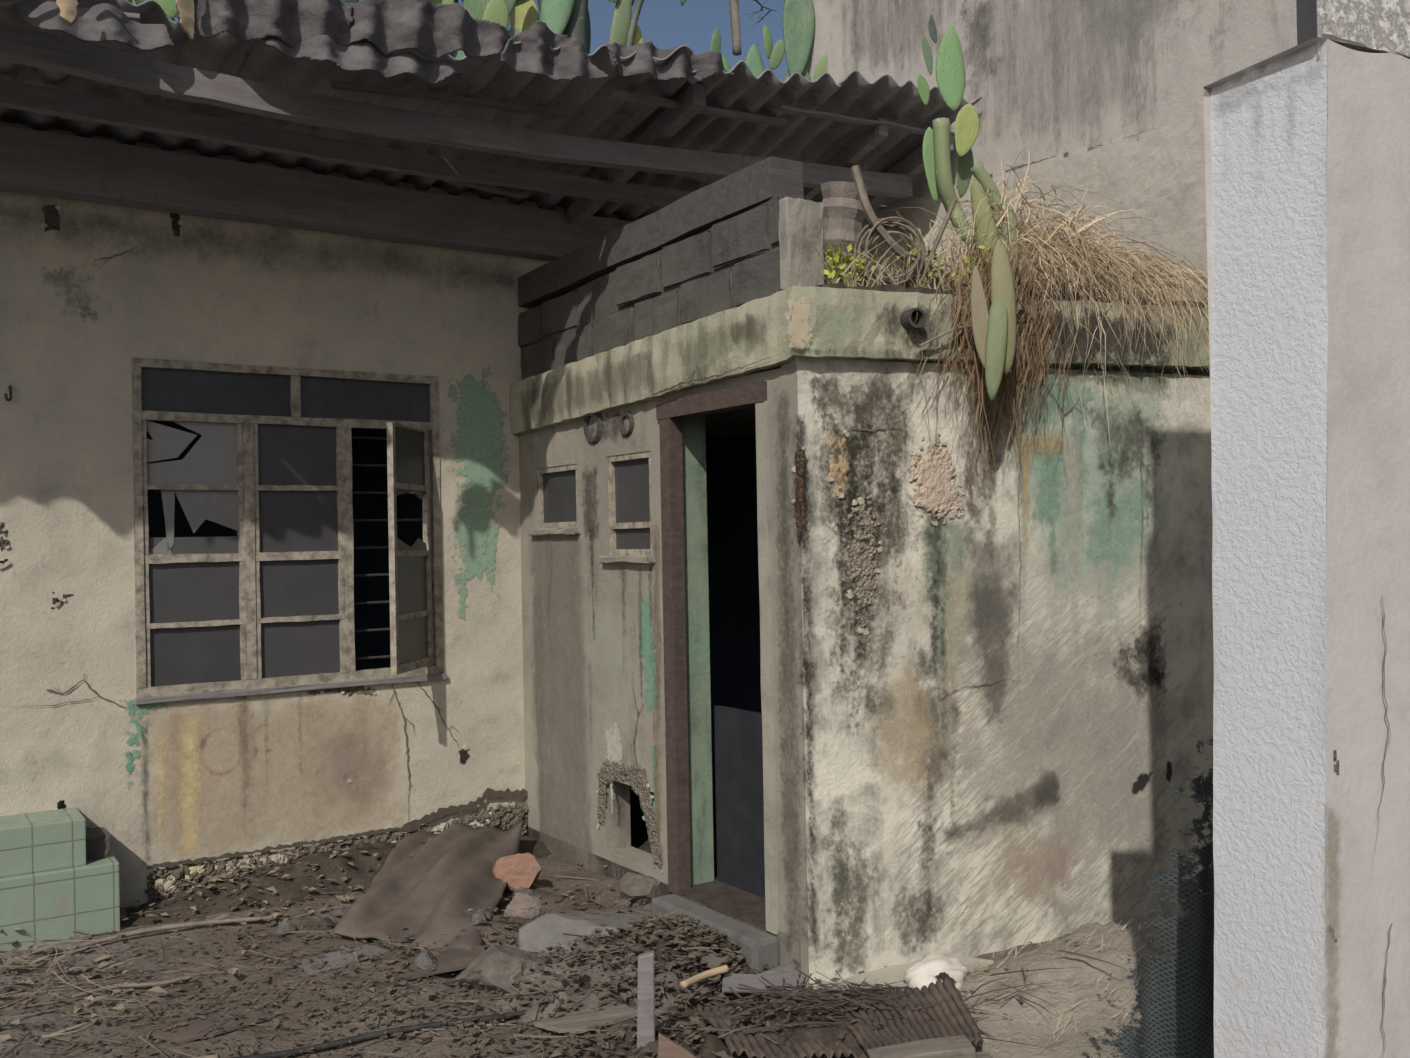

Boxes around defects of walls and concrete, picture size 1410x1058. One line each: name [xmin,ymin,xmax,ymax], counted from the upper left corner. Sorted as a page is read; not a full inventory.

damp [785,295,814,350]
damp [885,306,974,345]
damp [1016,306,1178,365]
flaking render [907,433,966,526]
damp [1092,409,1158,515]
flaking render [0,522,11,569]
peeling [485,520,501,590]
damp [777,375,922,964]
damp [917,511,1172,868]
crack [388,681,462,821]
spalling [596,759,663,873]
damp [902,891,938,948]